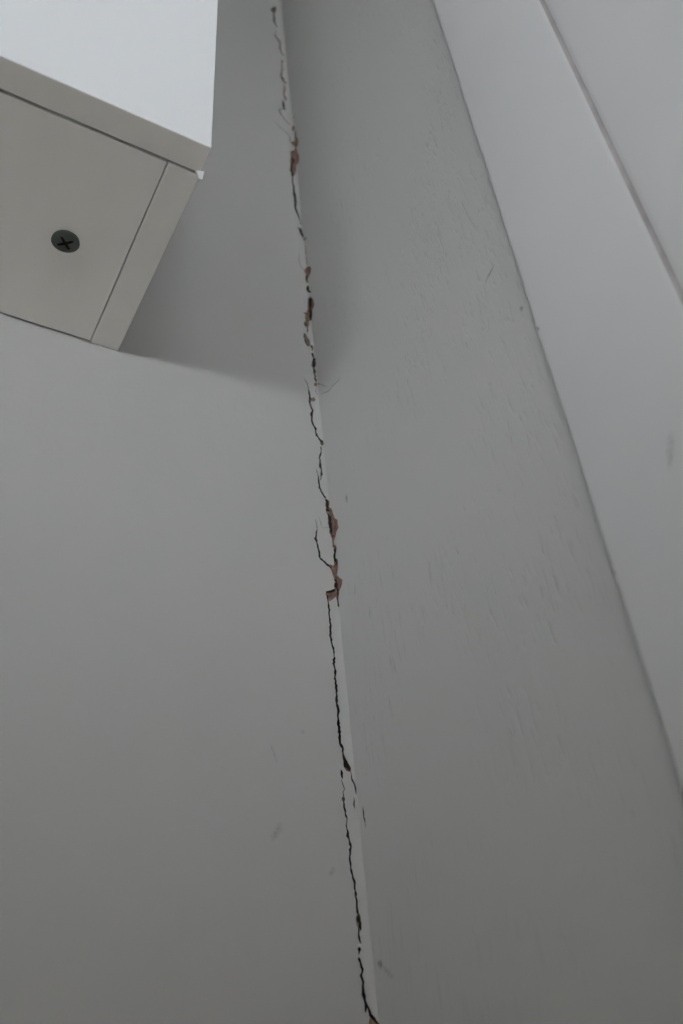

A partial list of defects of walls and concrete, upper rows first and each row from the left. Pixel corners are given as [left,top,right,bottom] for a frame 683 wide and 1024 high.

crack [270,7,294,141]
crack [292,177,306,241]
crack [305,380,339,499]
flaking render [314,499,343,607]
crack [328,601,379,1024]